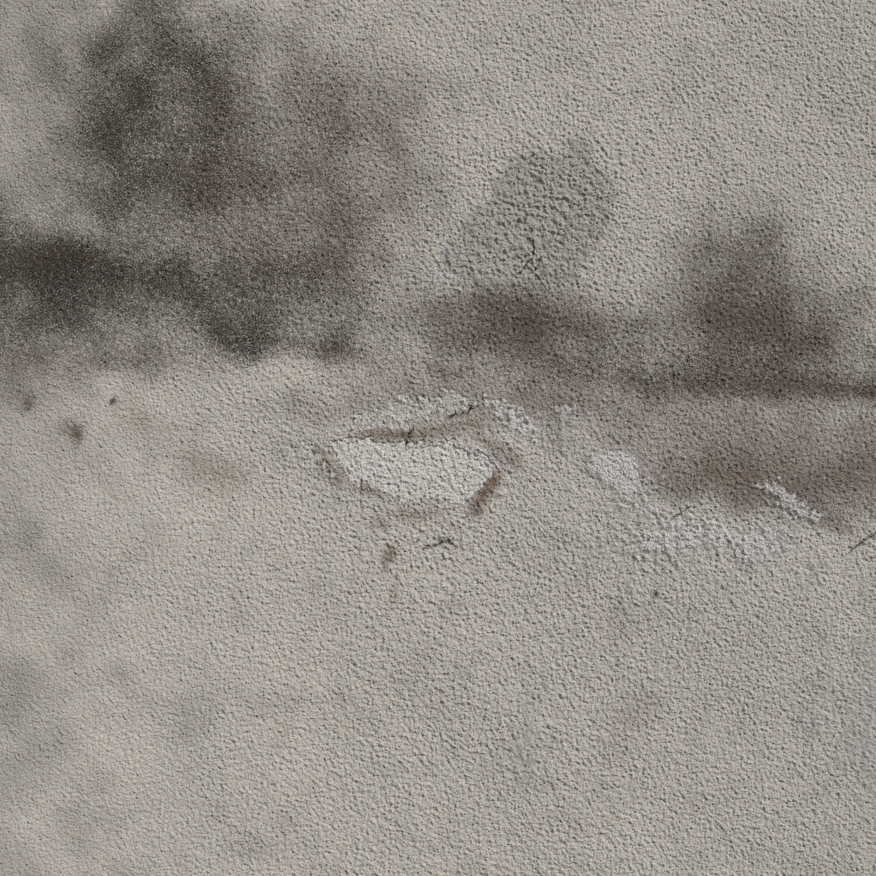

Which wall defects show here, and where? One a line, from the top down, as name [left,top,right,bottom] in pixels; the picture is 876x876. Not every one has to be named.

spalling [276,389,537,509]